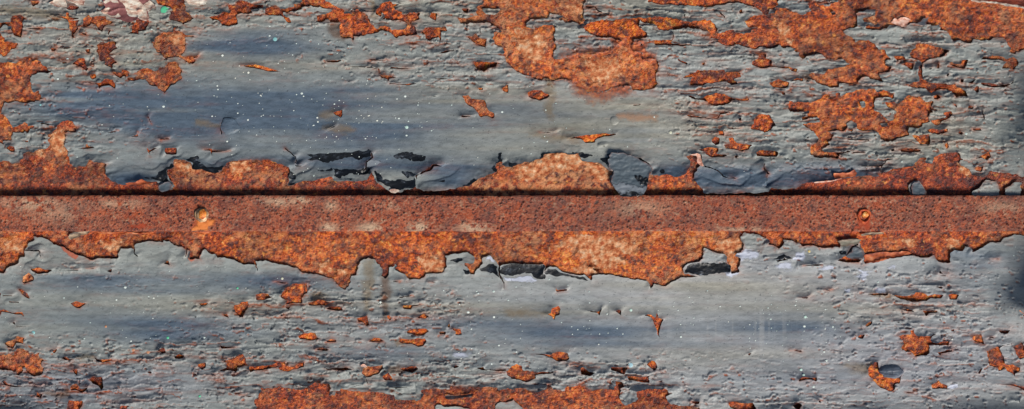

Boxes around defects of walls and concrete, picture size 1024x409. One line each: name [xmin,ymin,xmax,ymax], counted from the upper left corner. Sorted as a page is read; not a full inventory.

rust [0,15,51,144]
rust [68,0,198,93]
rust [458,0,1024,196]
rust [0,120,619,196]
peeling [608,153,652,197]
rust [0,220,1024,309]
rust [0,336,44,376]
rust [254,352,700,409]
rust [868,362,901,392]
rust [899,330,950,357]